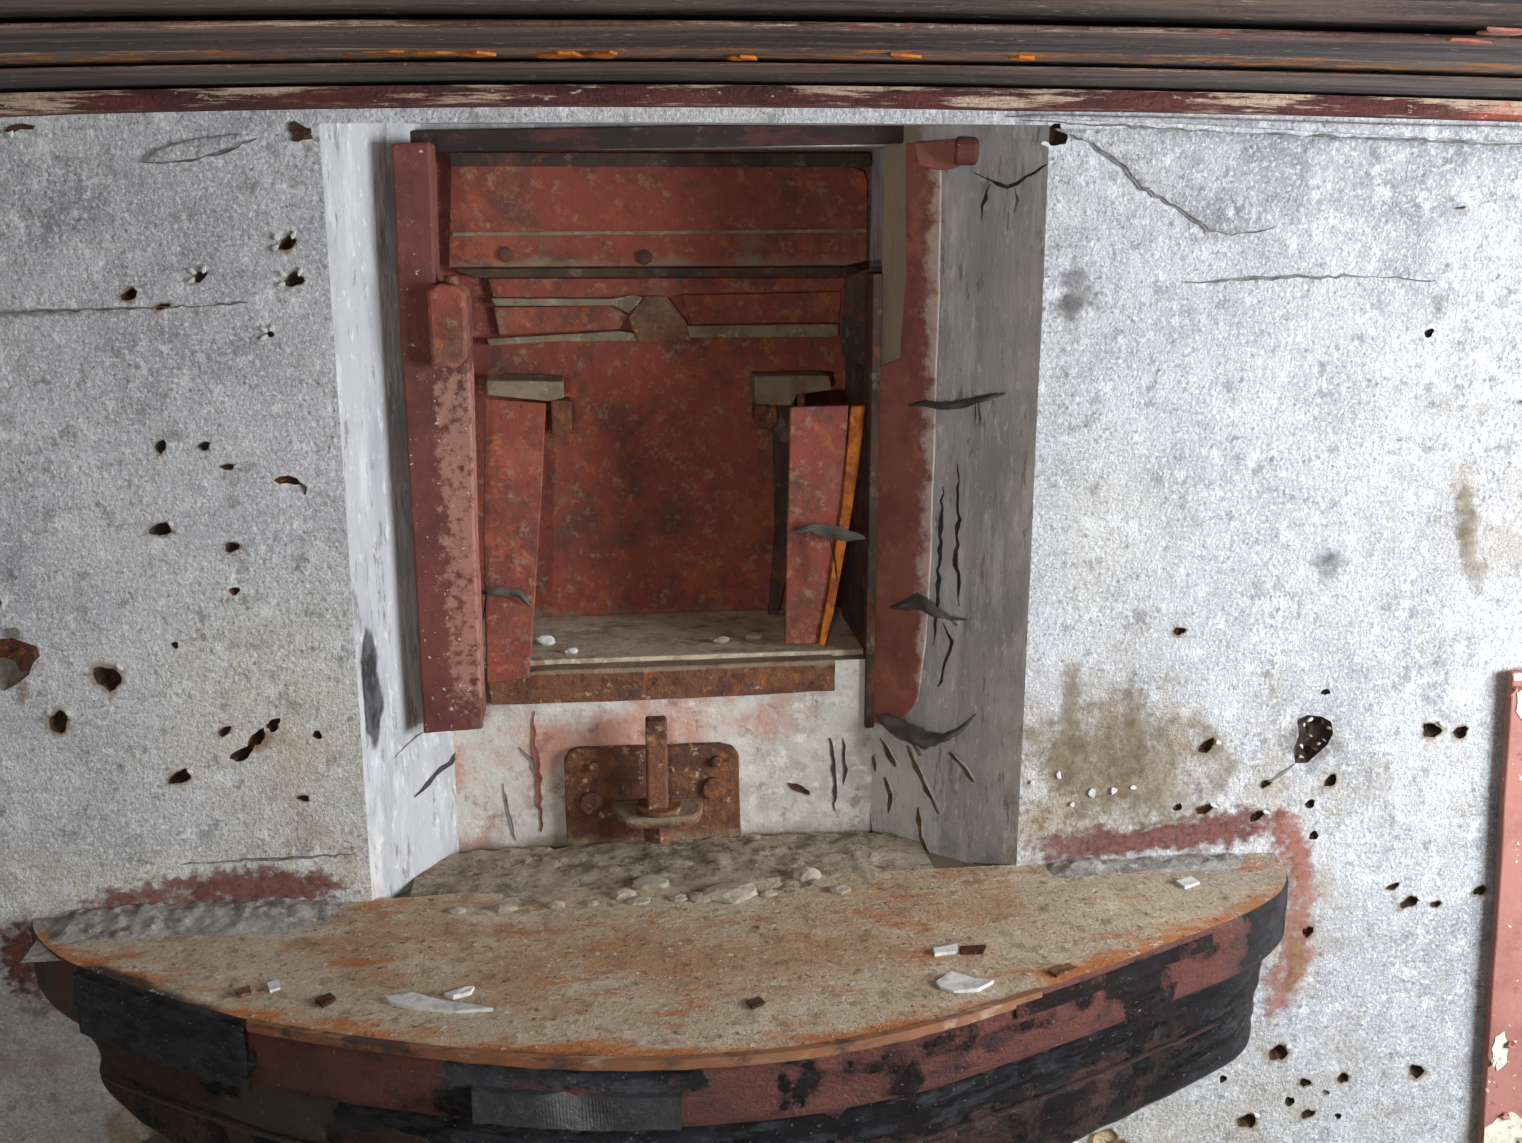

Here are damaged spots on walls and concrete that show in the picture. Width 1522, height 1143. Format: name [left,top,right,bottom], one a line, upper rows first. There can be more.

corrosion [818,405,865,646]
crack [933,464,962,687]
peeling [1513,686,1522,719]
crack [829,738,848,812]
peeling [1490,1031,1516,1071]
peeling [1483,1112,1522,1143]